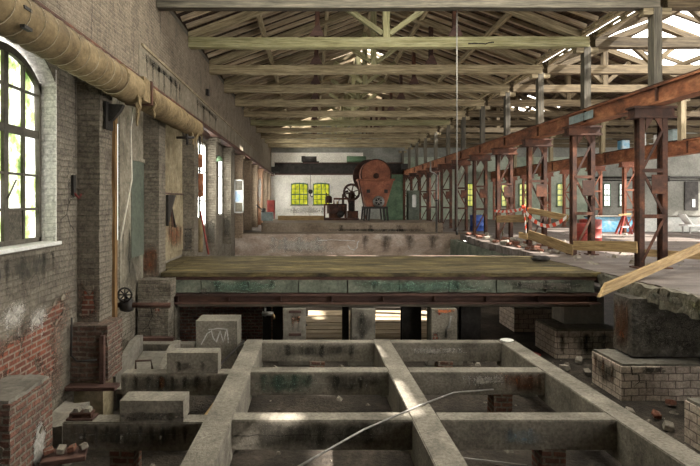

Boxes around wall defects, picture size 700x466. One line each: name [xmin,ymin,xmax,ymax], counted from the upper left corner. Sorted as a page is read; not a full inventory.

leakage [341,225,412,245]
efflorescence [6,305,24,324]
flaking render [0,294,65,385]